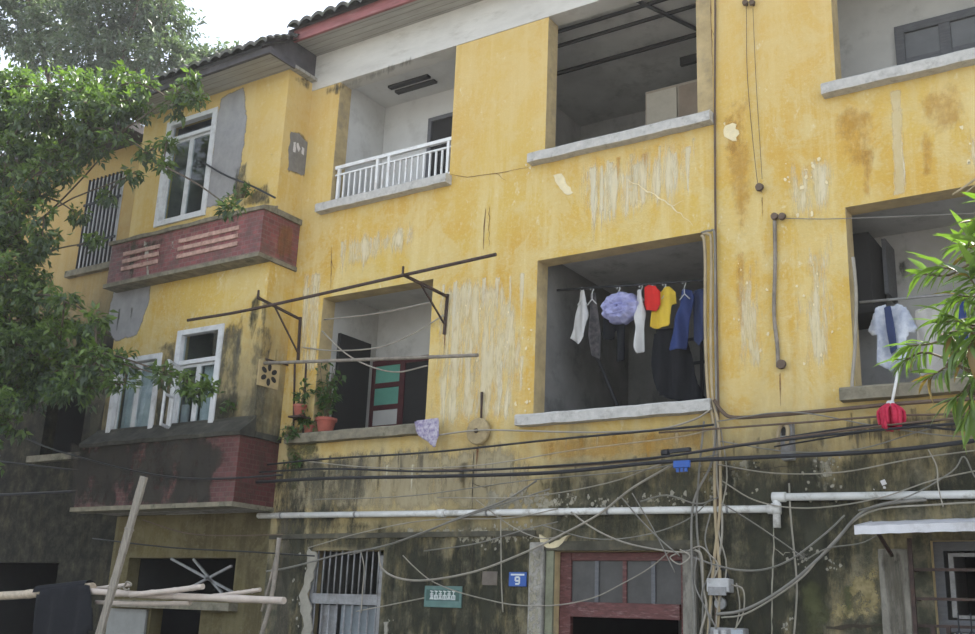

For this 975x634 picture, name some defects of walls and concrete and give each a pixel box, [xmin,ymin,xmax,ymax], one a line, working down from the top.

spalling [287,132,308,175]
peeling [553,173,573,195]
damp [590,146,690,223]
damp [214,325,241,419]
damp [249,329,271,420]
damp [545,474,575,528]
damp [585,421,916,634]
damp [931,446,975,503]